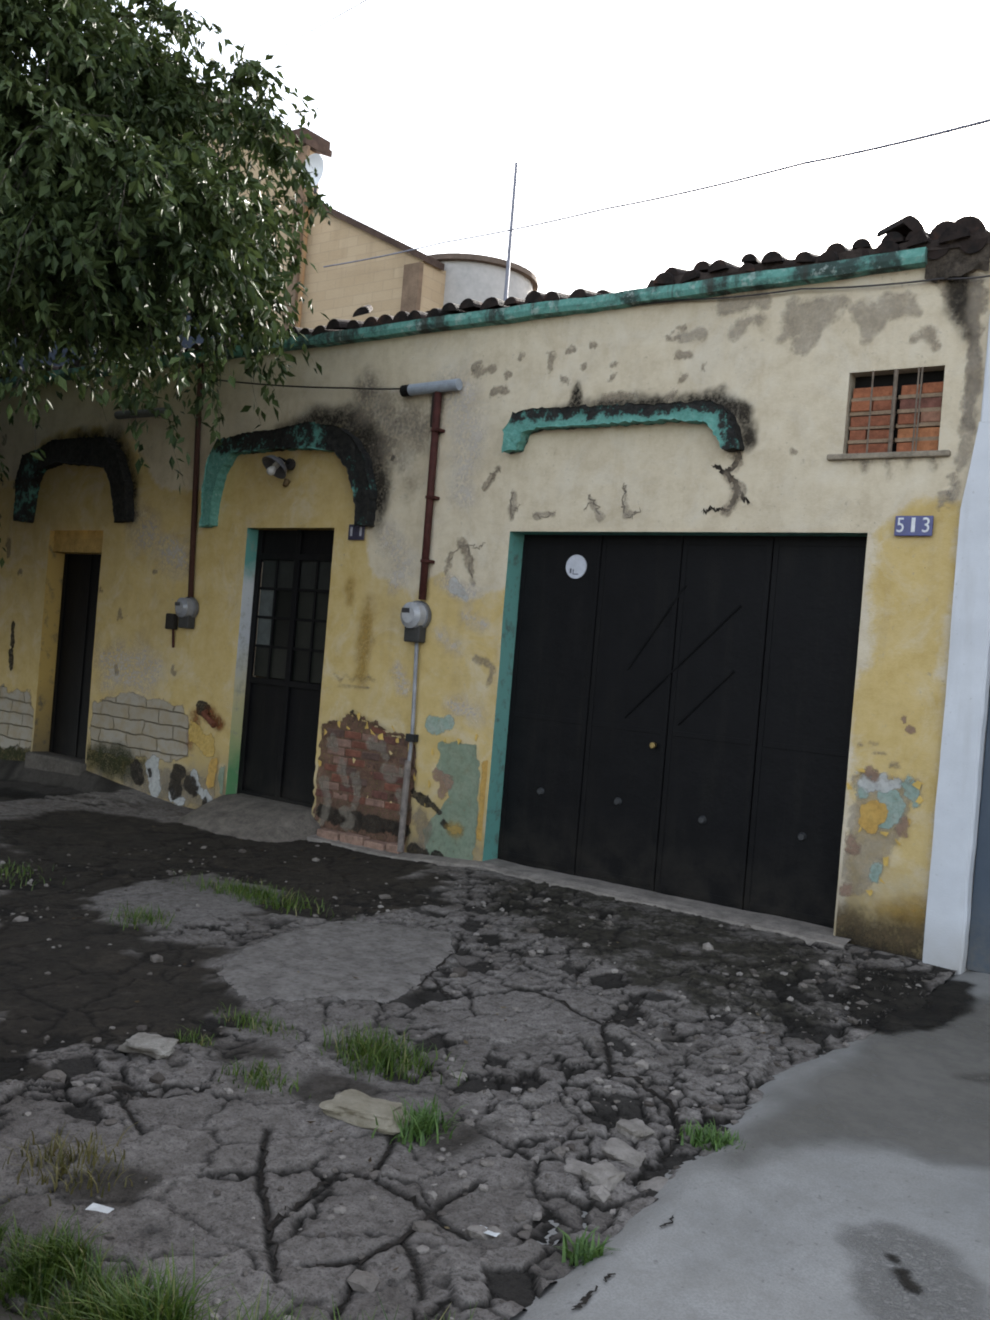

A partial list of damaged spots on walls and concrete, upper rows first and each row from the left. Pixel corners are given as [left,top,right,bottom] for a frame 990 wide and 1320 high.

peeling [668,325,704,382]
leakage [277,384,430,585]
crack [702,450,750,516]
spalling [130,700,225,806]
spalling [313,704,488,860]
peeling [839,763,925,896]
crack [411,936,462,998]
crack [37,1086,211,1135]
crack [543,994,748,1164]
crack [235,1129,479,1319]
crack [571,1273,616,1310]